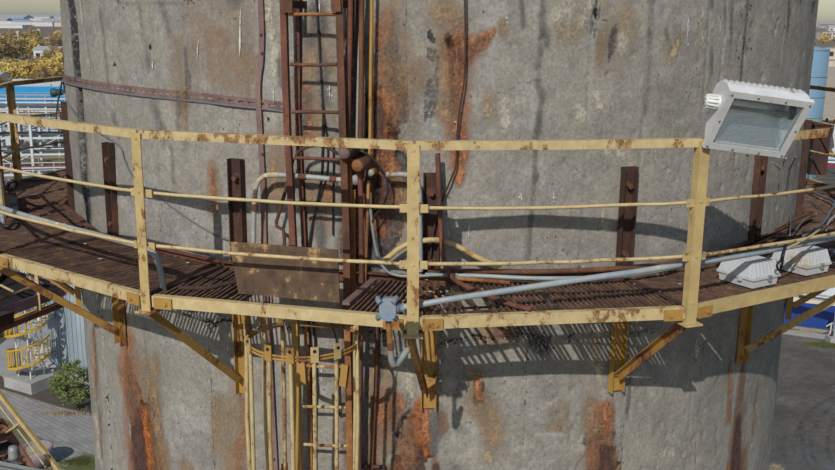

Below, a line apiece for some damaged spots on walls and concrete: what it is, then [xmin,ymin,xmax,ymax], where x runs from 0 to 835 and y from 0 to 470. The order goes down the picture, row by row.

leakage [264,0,282,86]
corrosion [433,0,506,140]
corrosion [449,150,467,185]
corrosion [118,330,168,470]
corrosion [368,350,447,470]
corrosion [586,400,621,470]
corrosion [727,361,759,470]